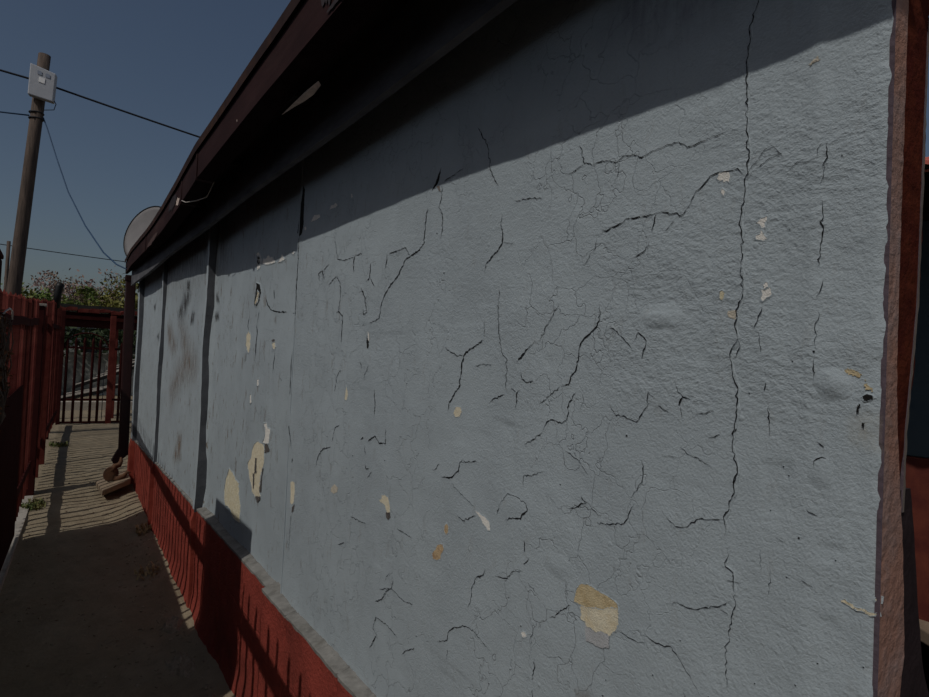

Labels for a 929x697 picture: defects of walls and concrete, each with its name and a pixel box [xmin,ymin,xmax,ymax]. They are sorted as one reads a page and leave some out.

crack [245,170,460,388]
crack [334,363,386,478]
crack [445,292,557,409]
crack [528,304,646,442]
crack [565,0,828,679]
peeling [224,421,271,523]
crack [434,460,475,521]
crack [497,472,541,520]
crack [369,575,415,654]
crack [469,542,535,604]
spalling [573,582,620,649]